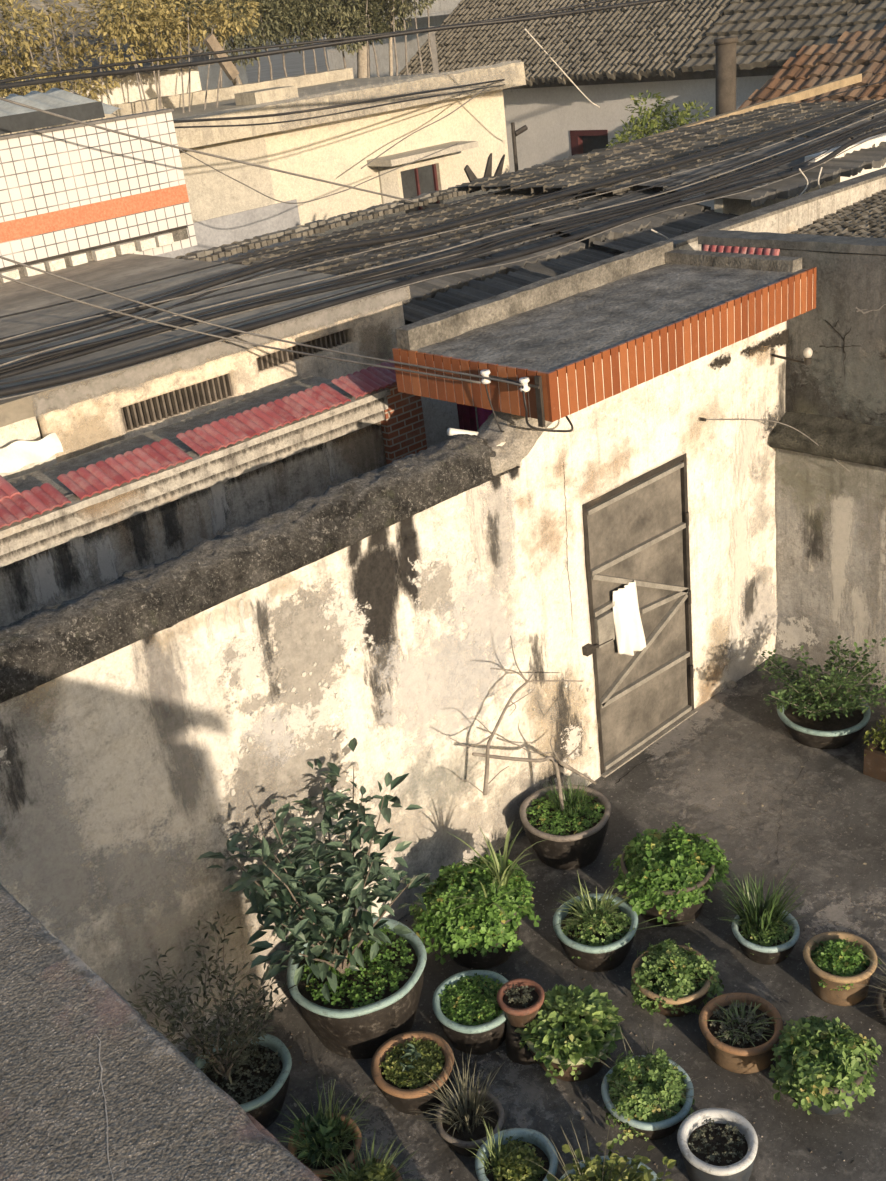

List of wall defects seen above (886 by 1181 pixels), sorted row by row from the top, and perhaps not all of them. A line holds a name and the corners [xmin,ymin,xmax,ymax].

leakage [5,536,118,612]
leakage [125,515,150,568]
leakage [161,499,183,549]
leakage [208,480,231,535]
leakage [208,600,280,699]
leakage [348,464,524,758]
leakage [728,336,886,677]
leakage [0,633,202,988]
crack [95,1034,114,1181]